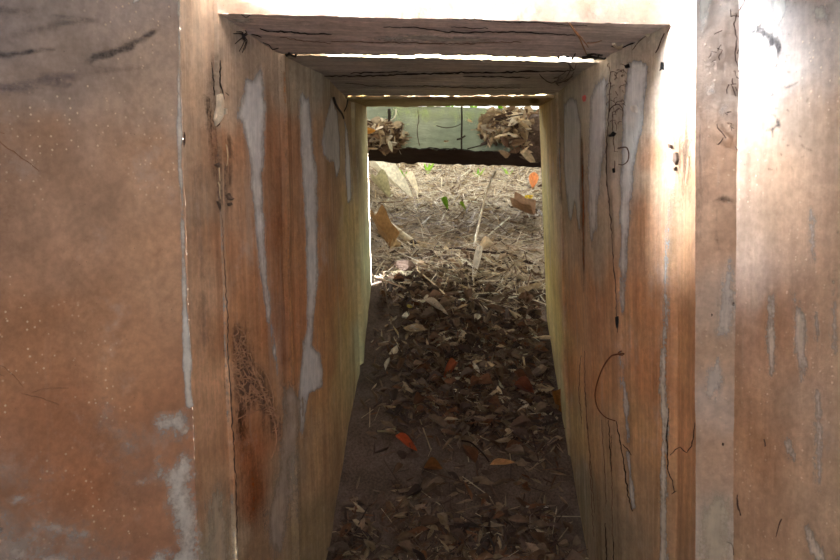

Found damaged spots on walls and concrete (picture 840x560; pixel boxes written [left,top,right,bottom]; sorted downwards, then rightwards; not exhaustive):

damp [240,74,270,317]
damp [322,99,351,201]
crack [241,14,587,50]
crack [324,70,574,89]
crack [406,108,493,152]
damp [269,94,322,556]
damp [158,413,188,436]
damp [155,455,198,560]